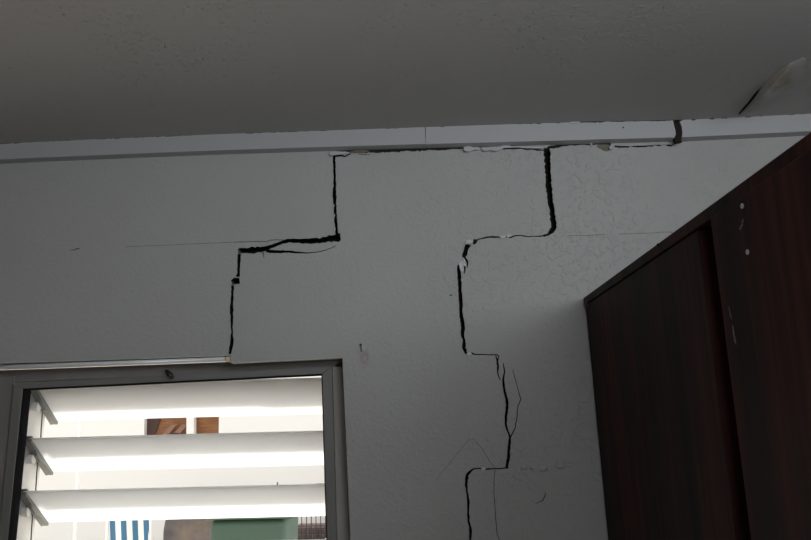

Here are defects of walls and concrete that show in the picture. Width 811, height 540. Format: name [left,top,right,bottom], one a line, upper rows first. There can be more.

crack [126,116,762,540]